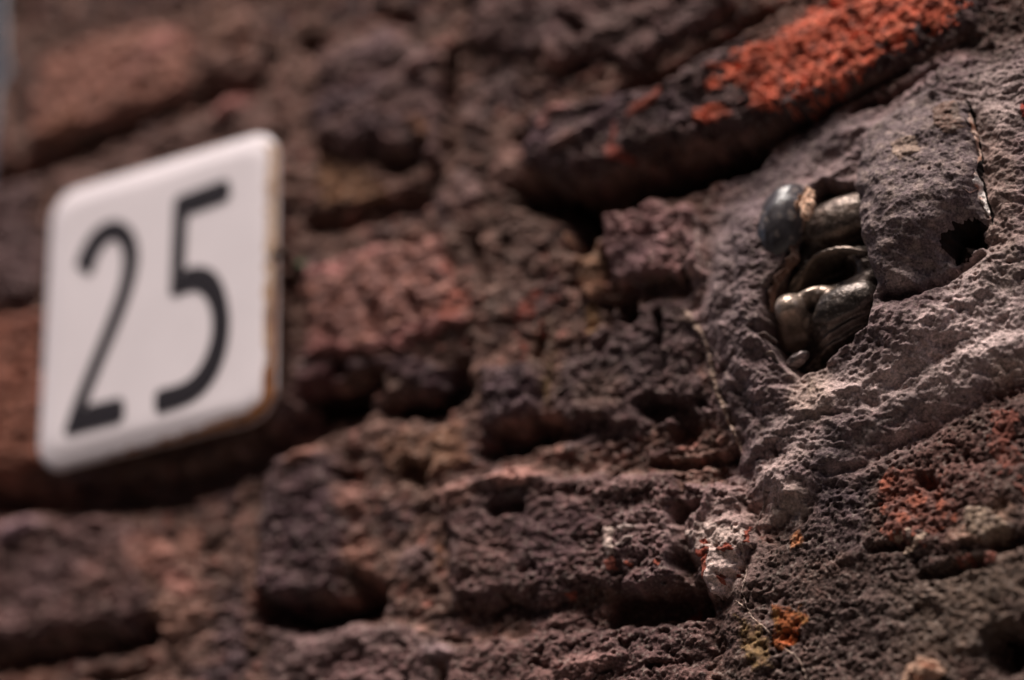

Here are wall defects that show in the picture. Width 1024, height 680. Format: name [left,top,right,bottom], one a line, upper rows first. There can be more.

crack [962,97,995,224]
peeling [764,186,817,313]